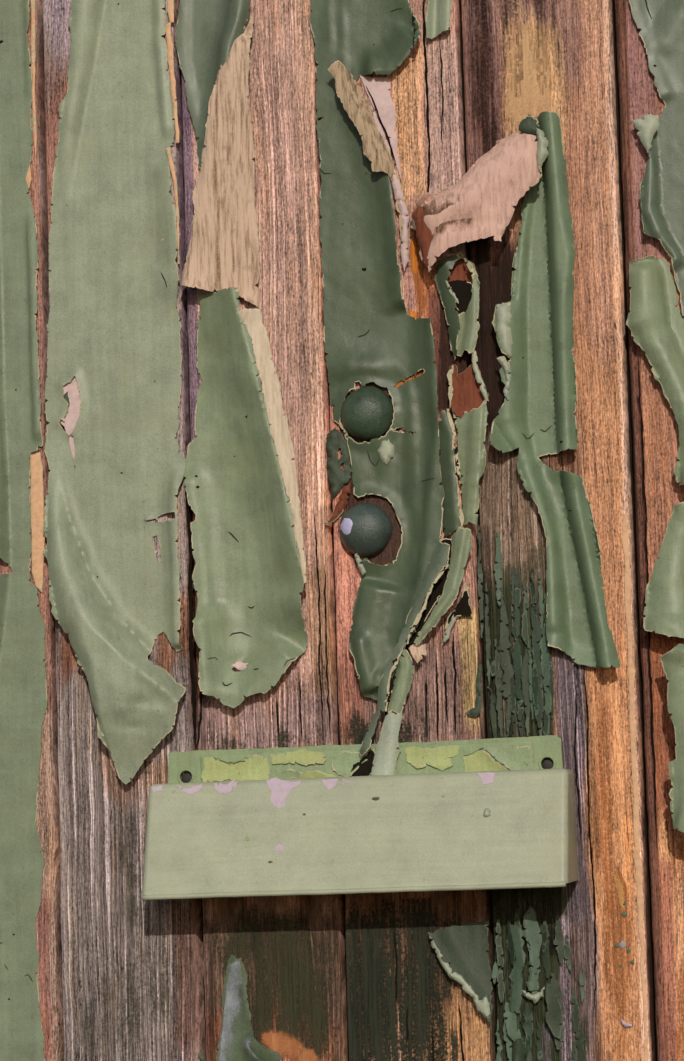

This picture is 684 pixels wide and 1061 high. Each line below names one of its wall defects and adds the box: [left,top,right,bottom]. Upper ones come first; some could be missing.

peeling [0,0,319,1061]
peeling [176,0,621,808]
peeling [626,0,684,486]
peeling [643,502,684,833]
leakage [209,898,471,1061]
peeling [429,906,586,1061]